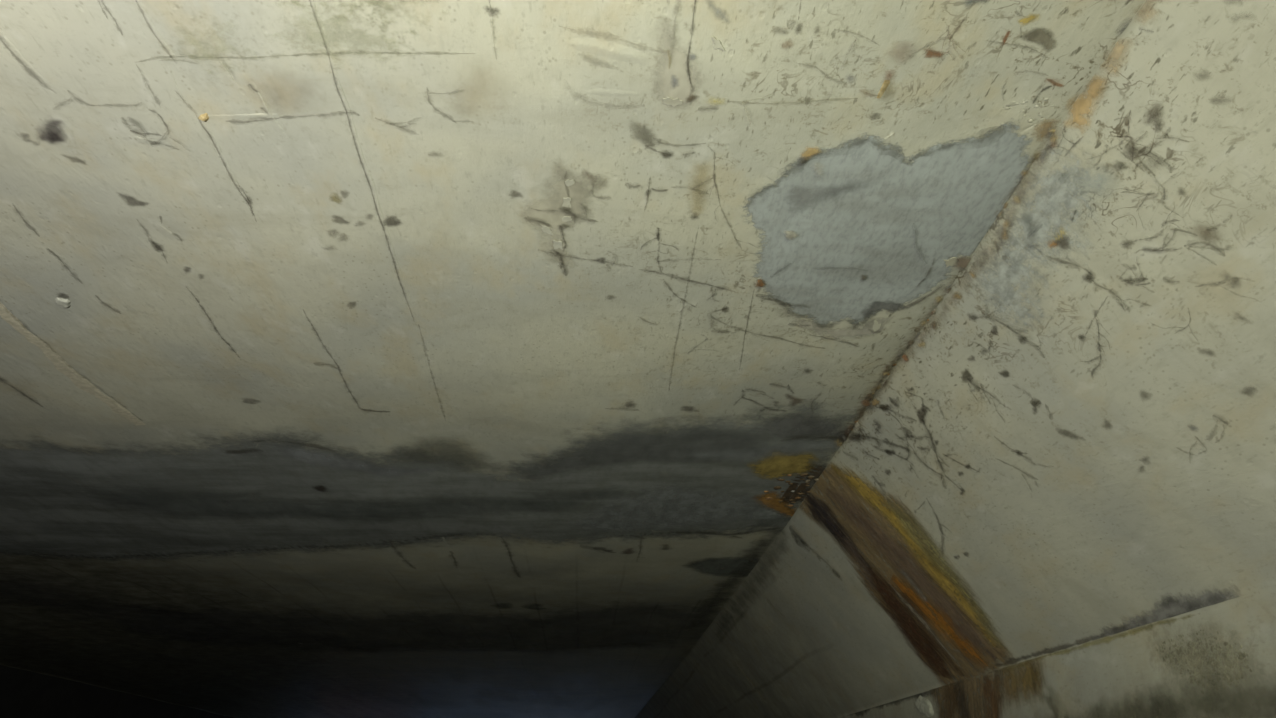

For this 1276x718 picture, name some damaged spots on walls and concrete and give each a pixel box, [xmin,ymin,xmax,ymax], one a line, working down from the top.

crack [135,136,160,145]
spalling [731,109,1043,331]
corrosion [1050,231,1068,248]
damp [0,407,851,558]
damp [688,558,758,576]
corrosion [751,451,1041,718]